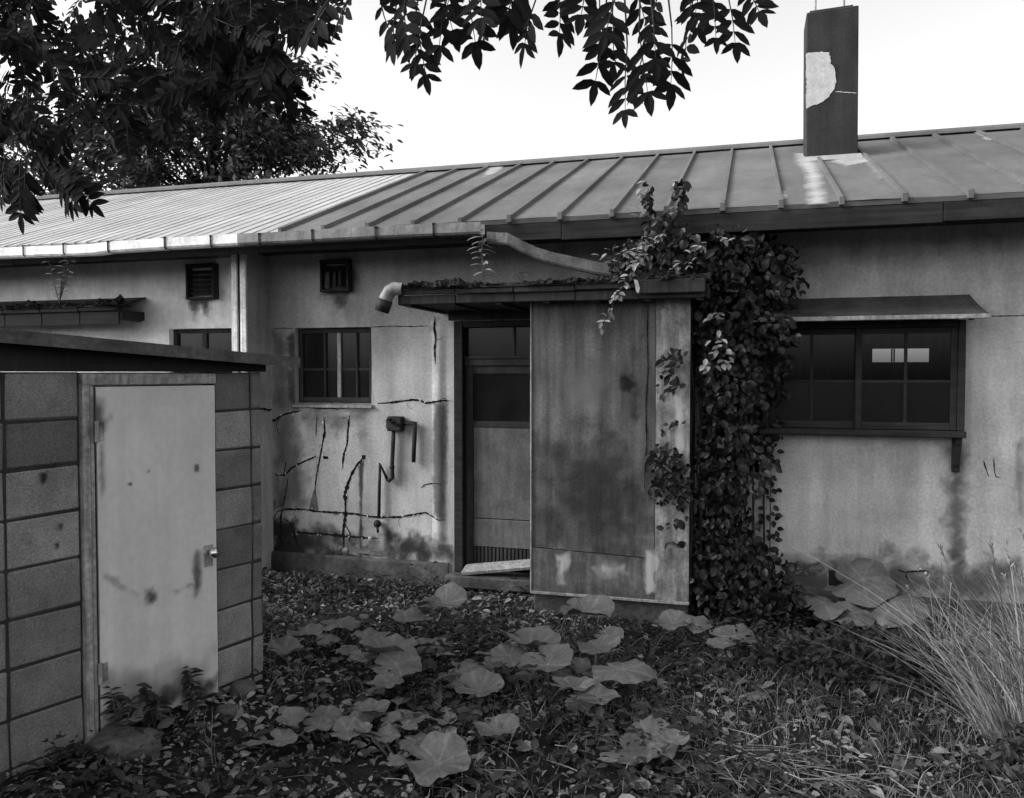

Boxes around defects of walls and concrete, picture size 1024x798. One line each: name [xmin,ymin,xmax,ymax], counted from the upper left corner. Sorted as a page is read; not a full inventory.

peeling [806,51,836,108]
crack [375,316,441,365]
crack [260,400,445,552]
damp [551,459,635,530]
damp [273,518,454,562]
peeling [557,553,570,584]
peeling [645,551,659,594]
damp [888,478,1018,599]